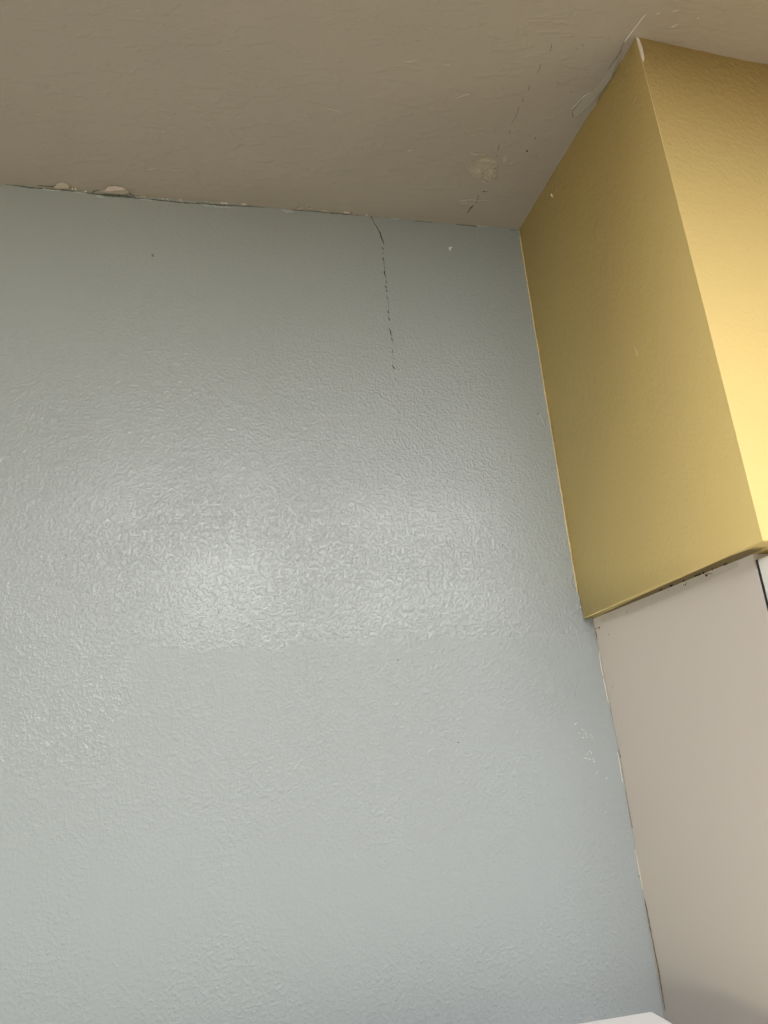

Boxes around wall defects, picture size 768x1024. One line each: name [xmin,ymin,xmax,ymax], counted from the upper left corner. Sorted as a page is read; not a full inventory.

crack [12,185,488,370]